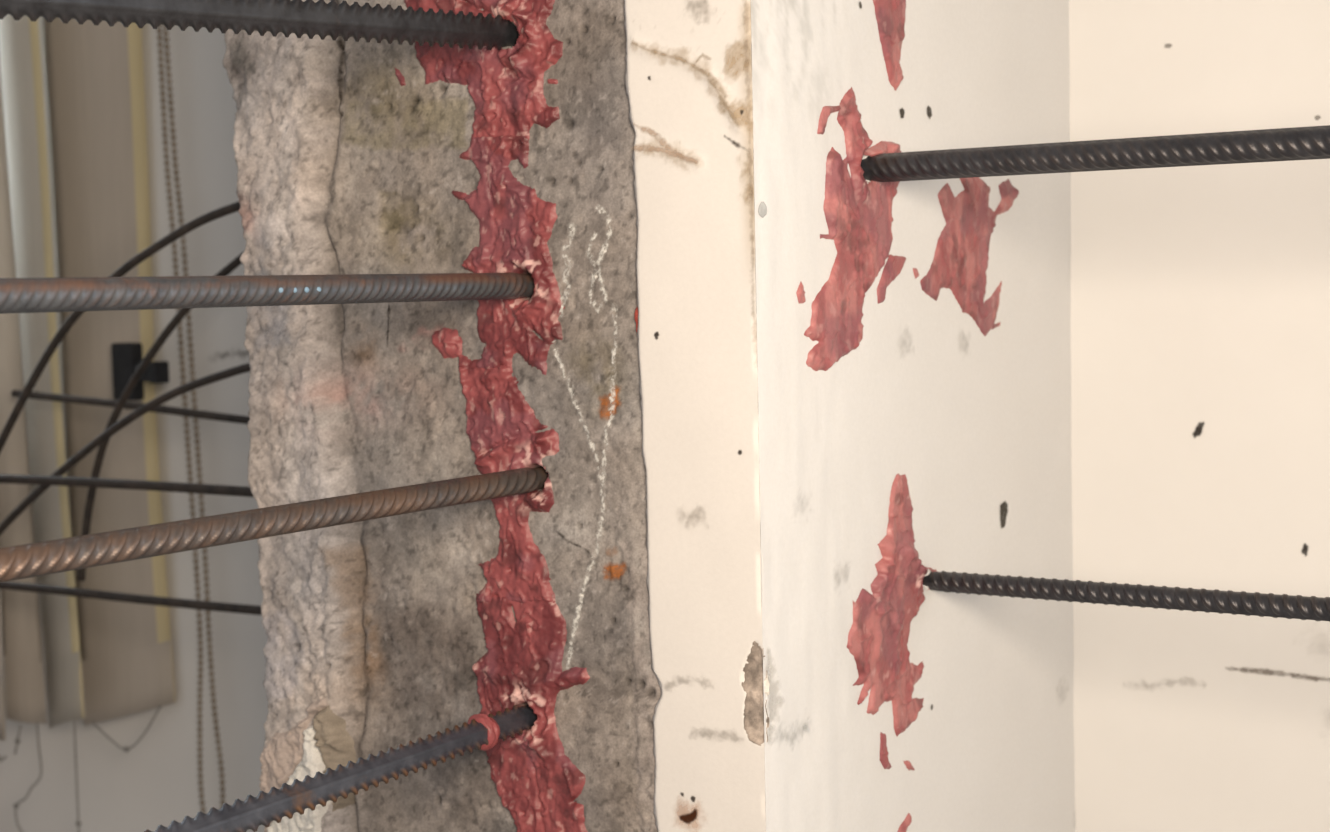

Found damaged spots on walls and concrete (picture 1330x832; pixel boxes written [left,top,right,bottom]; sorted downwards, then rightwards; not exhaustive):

peeling [796,282,806,304]
peeling [877,254,919,304]
spalling [313,705,356,773]
peeling [880,732,915,771]